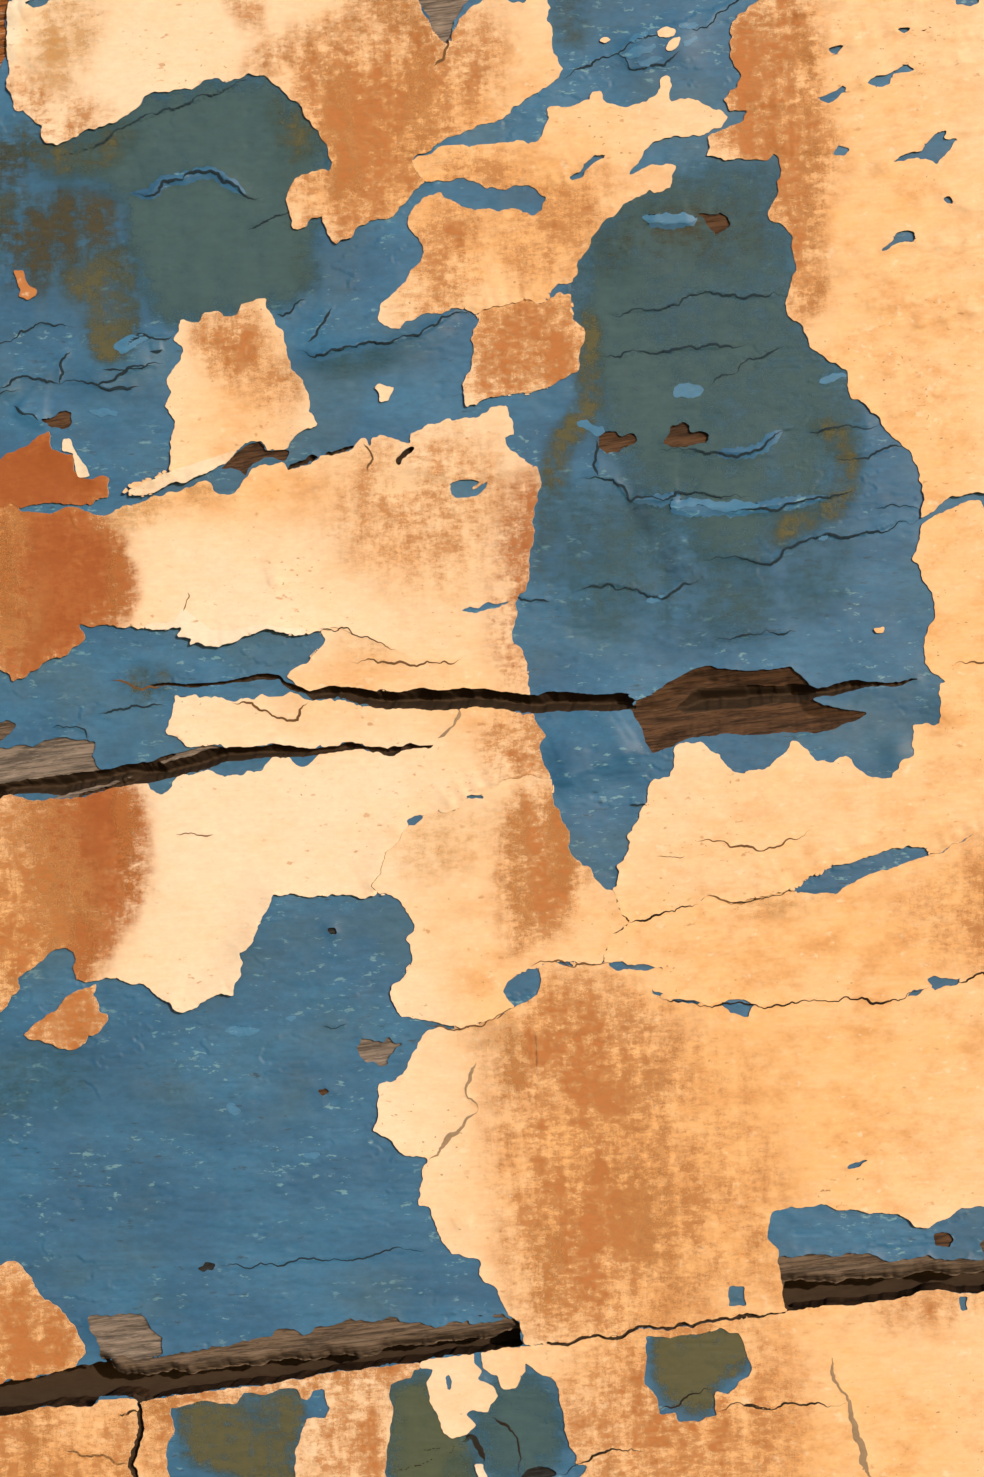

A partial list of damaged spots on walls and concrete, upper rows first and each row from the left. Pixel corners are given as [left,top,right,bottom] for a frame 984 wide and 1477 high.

peeling [642,212,730,235]
crack [0,627,636,799]
crack [676,678,917,713]
crack [522,1302,794,1346]
crack [67,1394,154,1477]
peeling [0,1395,238,1477]
peeling [170,1362,433,1477]
peeling [420,1354,498,1450]
crack [399,1416,522,1474]
peeling [473,1352,501,1387]
peeling [466,1364,587,1477]
crack [562,1448,642,1475]